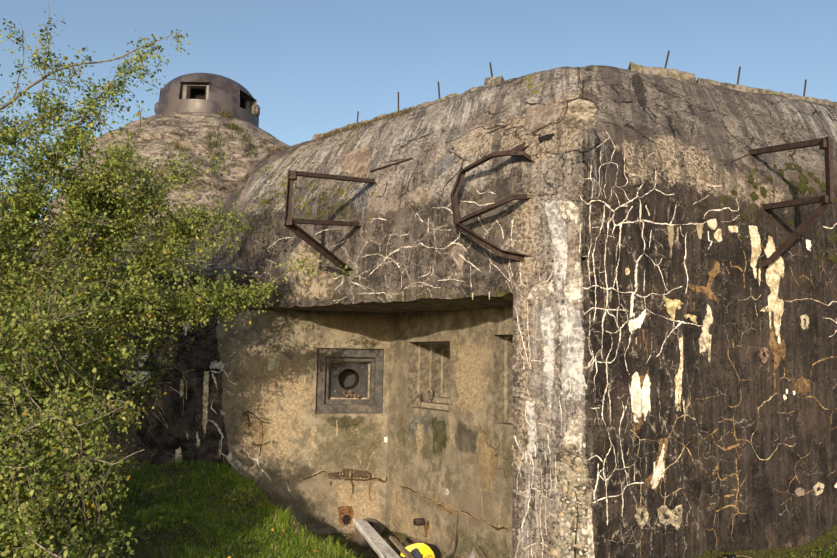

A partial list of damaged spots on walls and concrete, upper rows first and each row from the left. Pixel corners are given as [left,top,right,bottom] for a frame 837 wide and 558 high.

leakage [696,219,738,242]
crack [209,79,837,558]
leakage [528,200,587,432]
leakage [628,298,647,344]
leakage [630,372,651,422]
leakage [674,337,685,419]
leakage [699,304,713,362]
leakage [749,225,784,344]
rust [769,322,786,390]
rust [794,377,810,399]
leakage [525,401,537,499]
leakage [650,444,665,489]